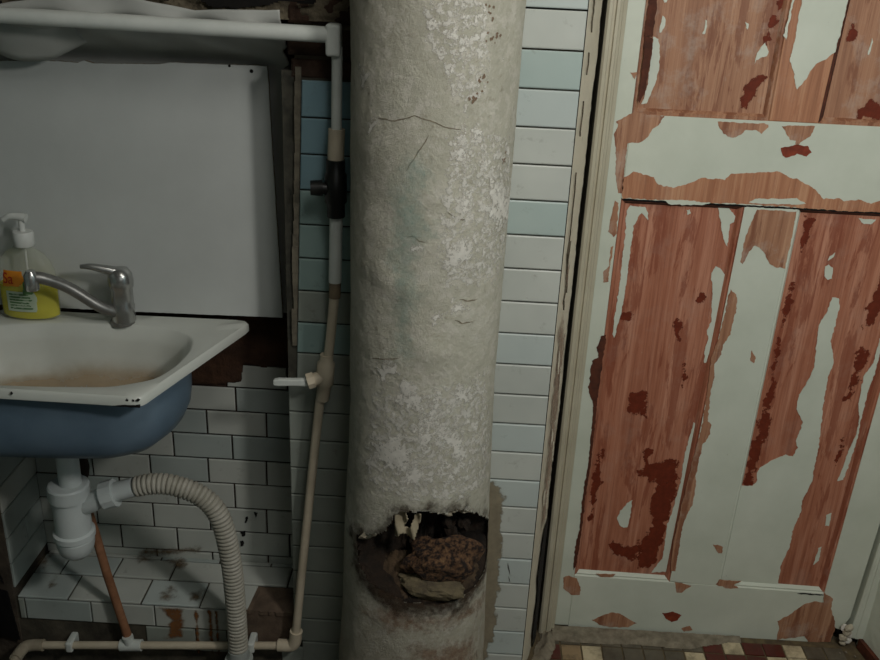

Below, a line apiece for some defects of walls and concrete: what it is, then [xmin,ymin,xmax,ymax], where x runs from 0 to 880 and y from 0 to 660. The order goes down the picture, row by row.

crack [379,115,461,171]
peeling [563,0,880,595]
spalling [191,316,288,385]
spalling [350,357,490,616]
corrosion [162,587,183,638]
corrosion [194,610,220,655]
peeling [592,612,636,628]
peeling [662,612,692,632]
peeling [777,593,854,646]